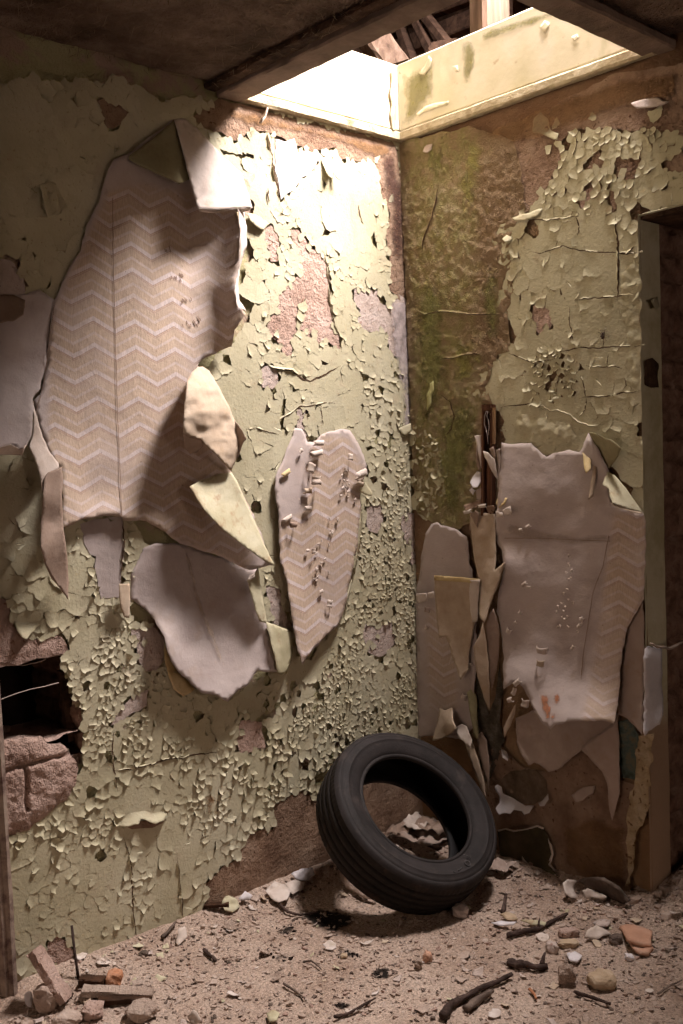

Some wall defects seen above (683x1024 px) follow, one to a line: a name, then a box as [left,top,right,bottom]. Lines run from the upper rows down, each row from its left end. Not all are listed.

peeling [0,71,407,391]
flaking render [209,62,683,773]
crack [501,215,645,426]
peeling [0,359,331,982]
flaking render [363,783,423,834]